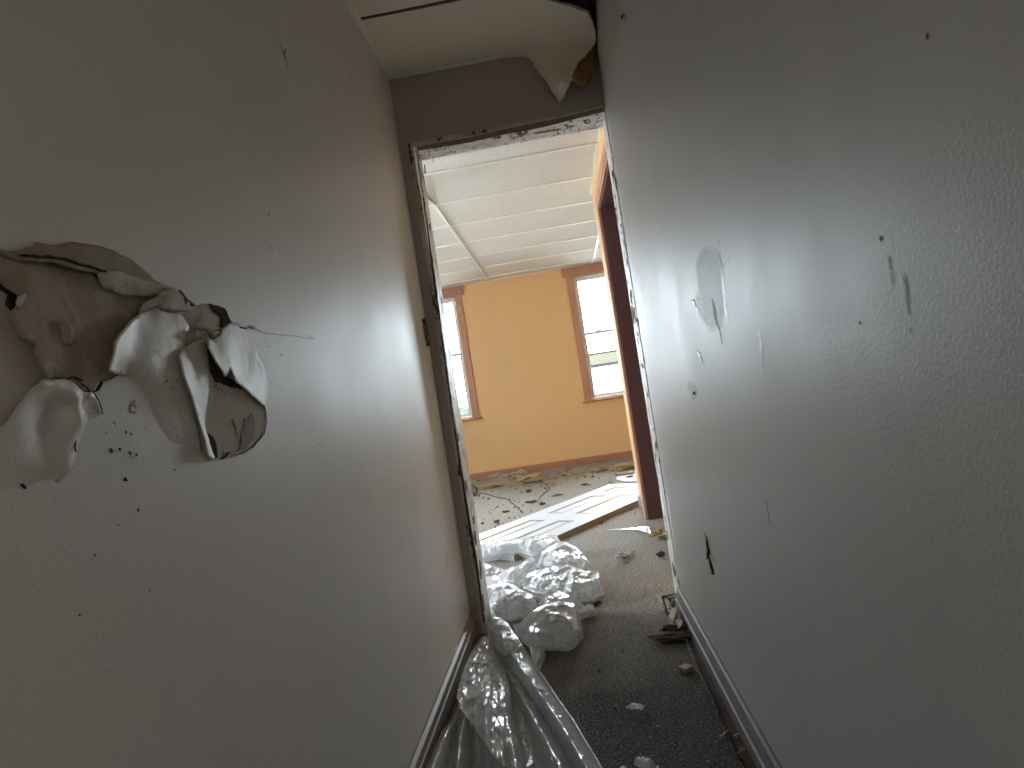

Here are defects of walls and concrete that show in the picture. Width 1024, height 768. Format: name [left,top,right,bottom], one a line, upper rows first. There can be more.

peeling [178,322,269,461]
peeling [416,106,604,623]